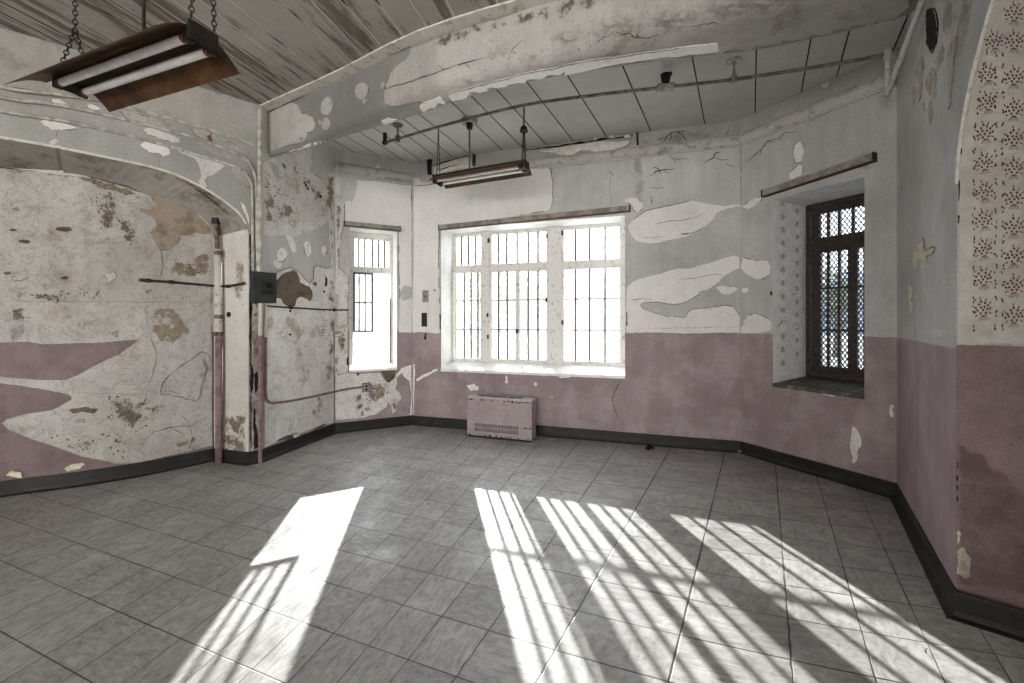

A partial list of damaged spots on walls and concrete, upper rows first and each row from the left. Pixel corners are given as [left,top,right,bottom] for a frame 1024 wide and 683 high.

peeling [0,31,75,104]
peeling [355,0,910,125]
peeling [40,120,76,145]
peeling [119,90,250,189]
crack [649,110,833,204]
peeling [623,197,762,244]
peeling [0,168,213,472]
peeling [249,96,554,451]
peeling [626,256,771,334]
crack [91,302,212,461]
peeling [5,470,23,478]
peeling [850,427,862,463]